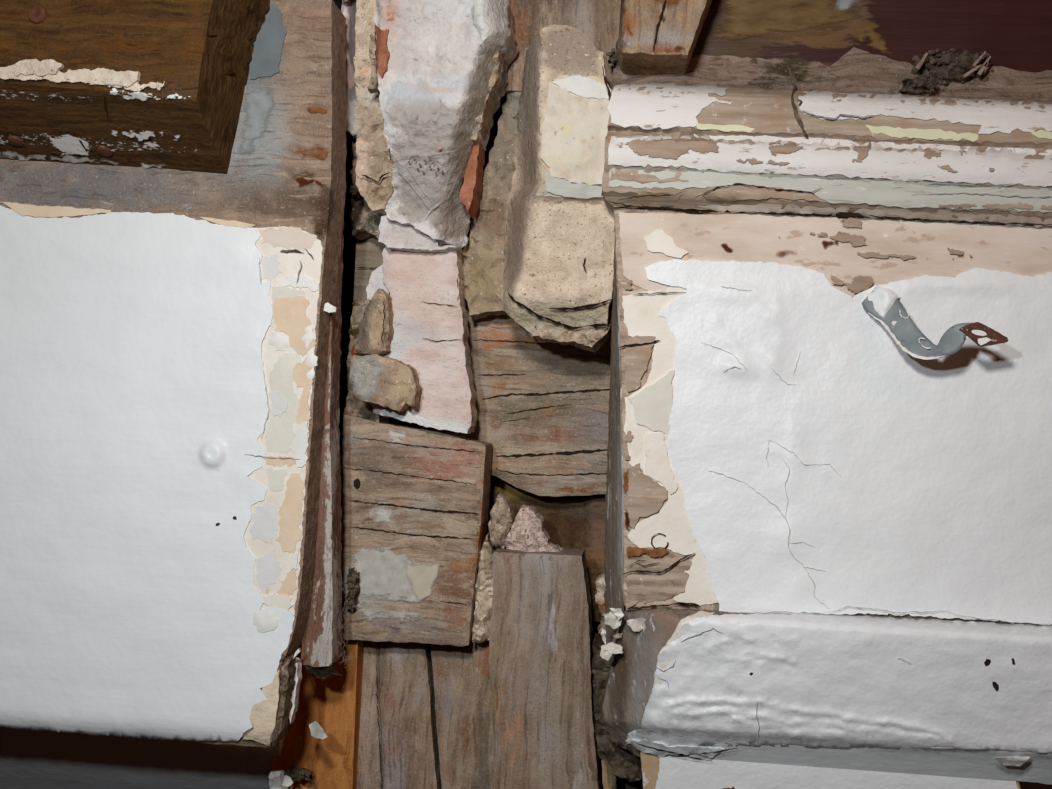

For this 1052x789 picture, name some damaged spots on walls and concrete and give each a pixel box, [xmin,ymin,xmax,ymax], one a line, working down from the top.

peeling [0,59,190,102]
peeling [0,202,112,218]
peeling [0,130,197,164]
rust [295,177,322,187]
peeling [540,75,719,200]
peeling [737,142,802,166]
peeling [830,275,873,293]
peeling [200,217,337,633]
peeling [624,335,678,529]
crack [712,440,1052,625]
spalling [600,553,695,661]
peeling [243,669,280,746]